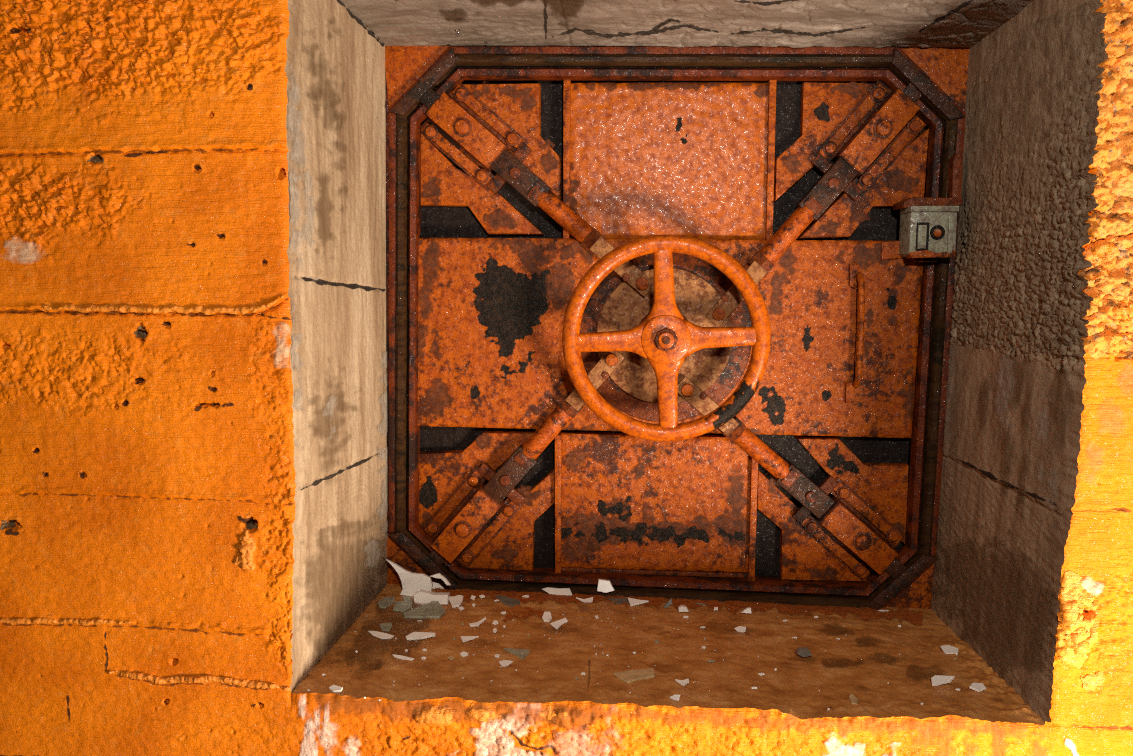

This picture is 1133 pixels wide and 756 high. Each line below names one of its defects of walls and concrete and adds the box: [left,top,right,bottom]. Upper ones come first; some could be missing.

crack [0,277,385,320]
corrosion [473,210,594,380]
corrosion [836,240,956,327]
corrosion [705,381,786,435]
corrosion [827,443,859,475]
crack [959,459,1057,506]
corrosion [561,471,749,562]
water stain [299,694,360,756]
water stain [472,703,567,756]
water stain [555,730,617,756]
water stain [826,722,865,756]
crack [1073,723,1133,731]